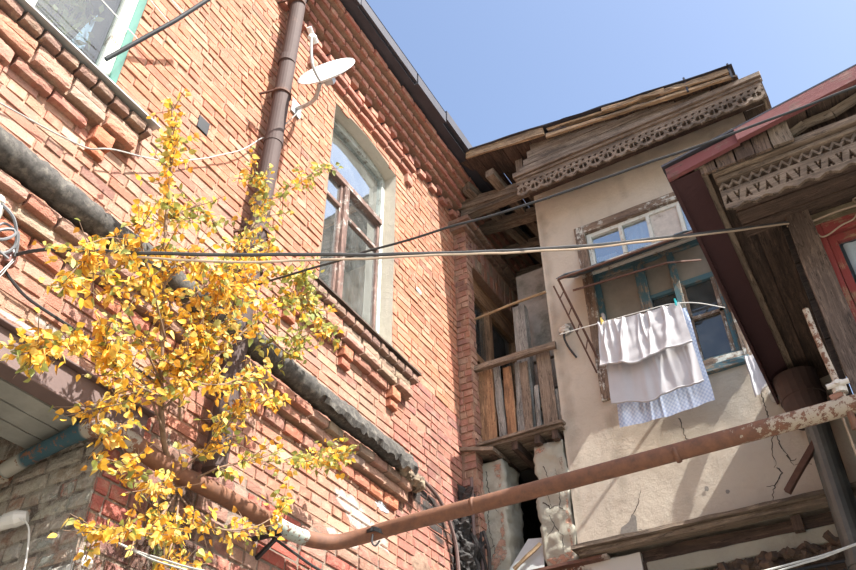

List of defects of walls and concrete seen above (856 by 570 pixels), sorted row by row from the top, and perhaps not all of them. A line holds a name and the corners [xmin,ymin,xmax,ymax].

crack [761,392,797,498]
crack [543,466,565,551]
damp [138,539,163,568]
damp [177,540,215,570]
spalling [704,530,843,570]